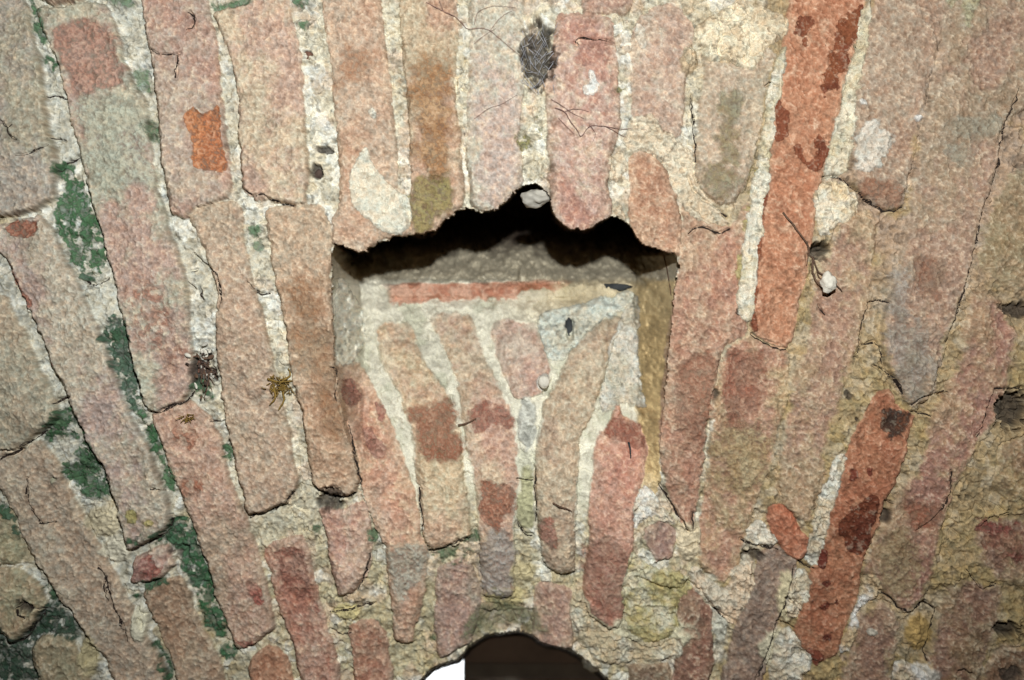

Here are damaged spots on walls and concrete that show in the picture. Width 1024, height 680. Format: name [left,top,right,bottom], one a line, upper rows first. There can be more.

spalling [520,189,551,208]
peeling [612,205,626,221]
crack [945,89,1019,343]
spalling [604,283,633,291]
spalling [342,378,362,406]
spalling [363,402,387,459]
spalling [468,400,515,433]